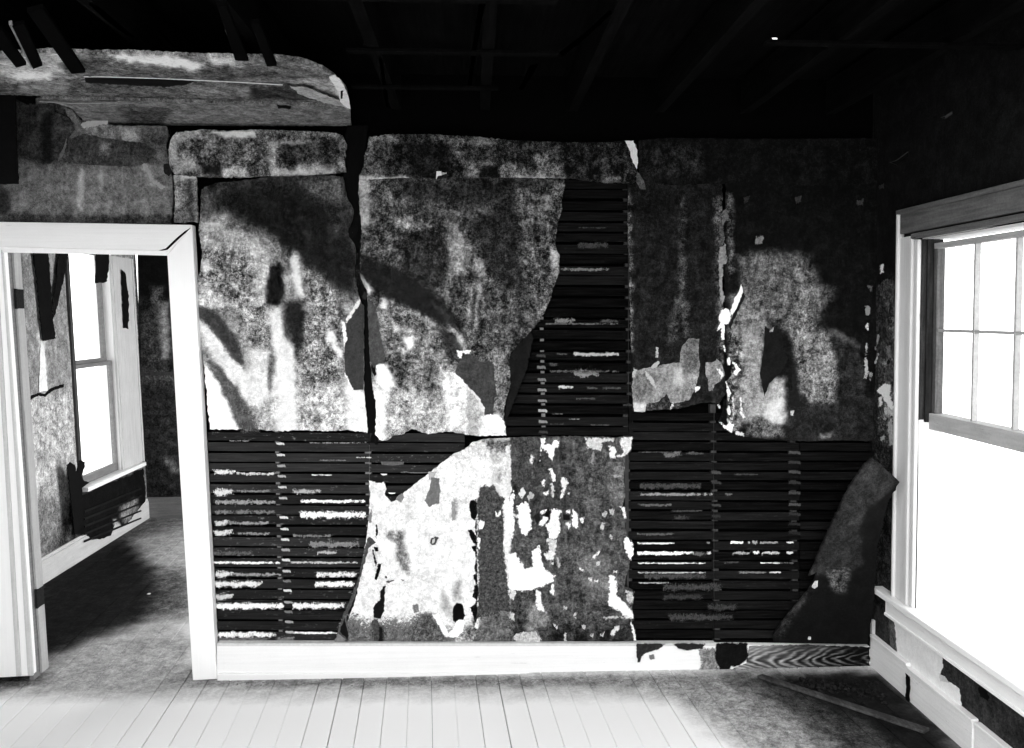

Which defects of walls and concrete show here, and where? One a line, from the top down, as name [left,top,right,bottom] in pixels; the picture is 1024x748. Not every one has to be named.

flaking render [207,431,465,642]
crack [343,125,378,445]
flaking render [454,141,895,669]